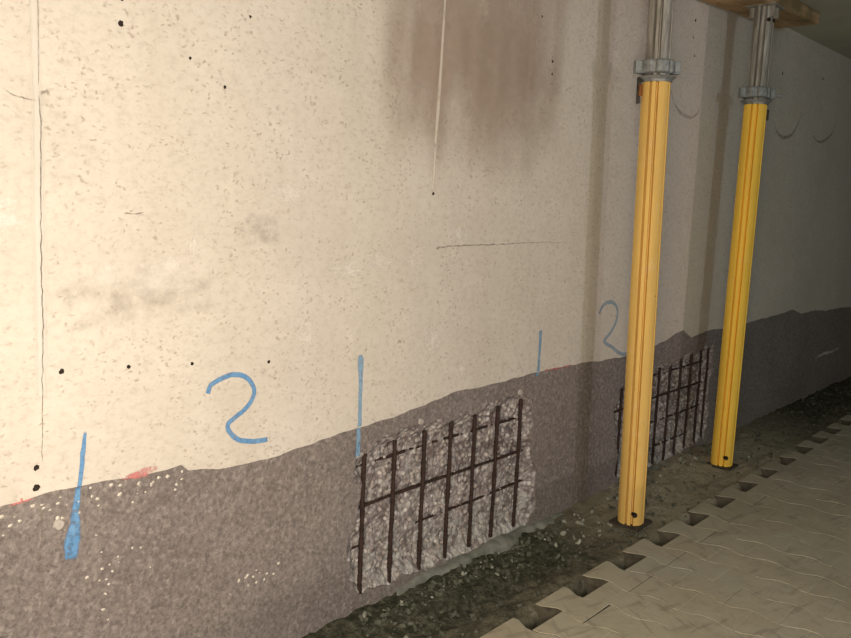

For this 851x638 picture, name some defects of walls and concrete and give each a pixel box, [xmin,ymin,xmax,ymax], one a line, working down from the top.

damp [413,0,537,190]
crack [21,96,44,459]
spalling [647,329,723,468]
peeling [736,307,851,427]
peeling [0,356,627,638]